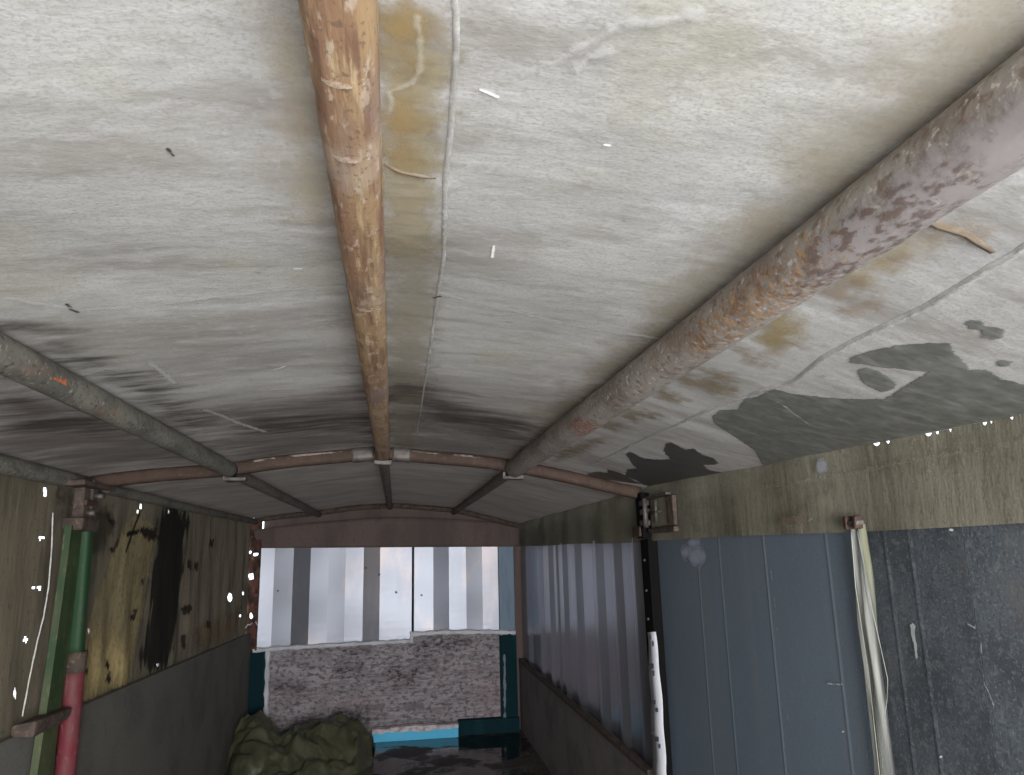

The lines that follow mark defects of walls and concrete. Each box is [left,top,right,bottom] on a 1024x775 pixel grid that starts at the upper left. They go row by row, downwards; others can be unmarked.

corrosion [585,163,990,393]
damp [83,507,241,703]